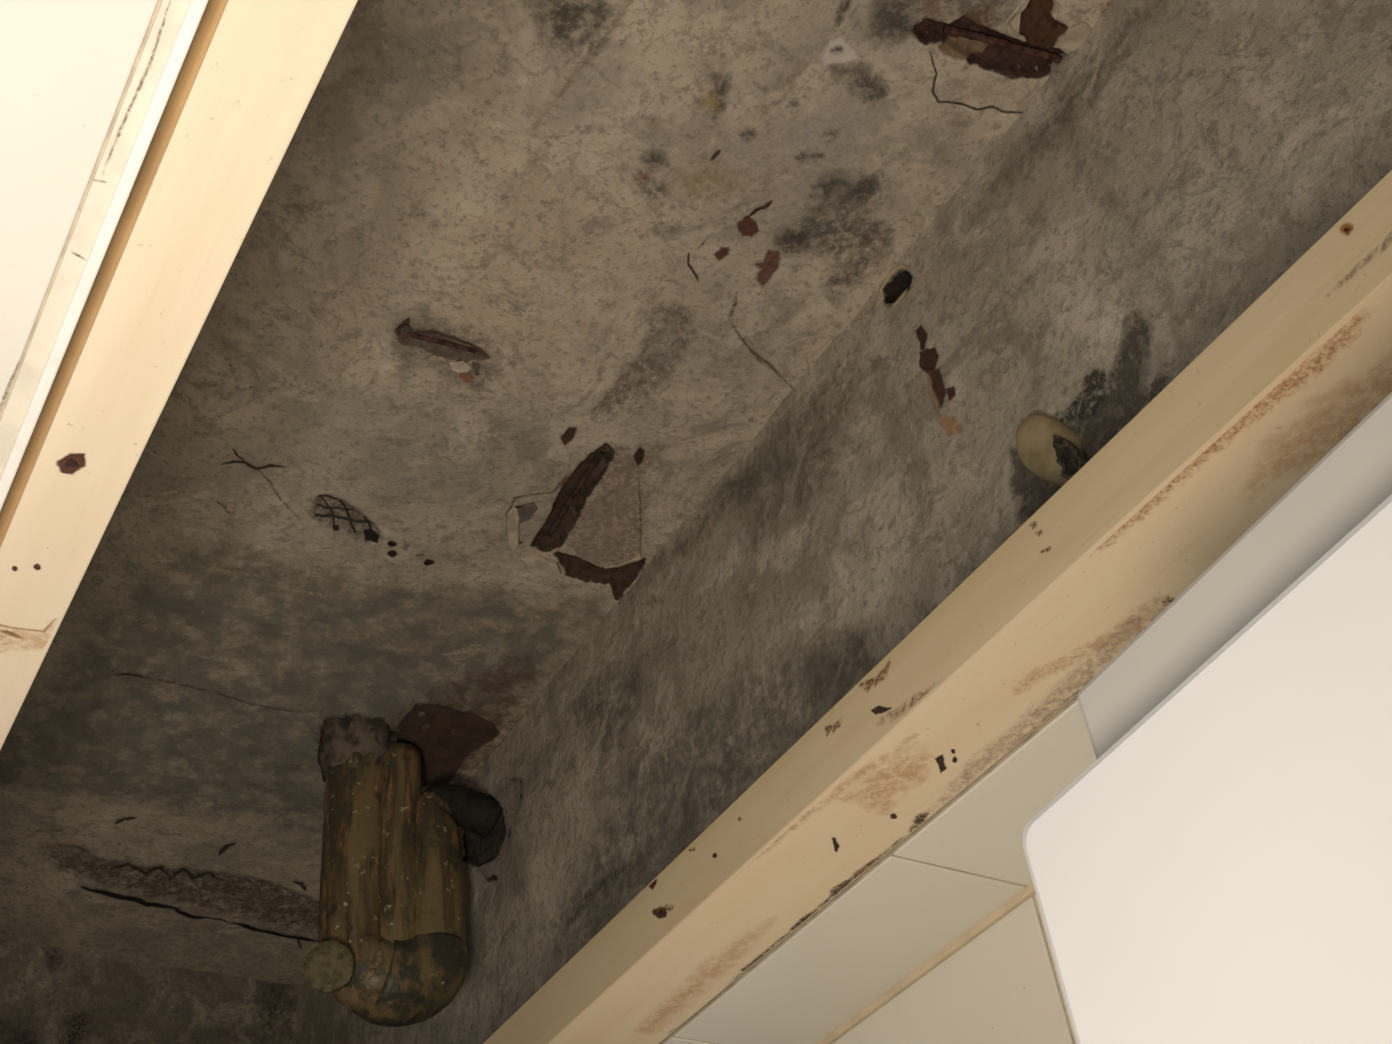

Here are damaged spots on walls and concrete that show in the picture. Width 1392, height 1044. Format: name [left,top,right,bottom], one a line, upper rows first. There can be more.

water stain [540,0,607,46]
spalling [912,0,1092,79]
spalling [395,318,490,386]
water stain [1056,313,1165,462]
rust [57,454,85,474]
spalling [313,495,434,565]
spalling [506,443,647,600]
water stain [1011,449,1060,553]
water stain [1109,319,1360,538]
water stain [860,662,890,690]
crack [82,886,318,949]
water stain [654,813,929,1022]